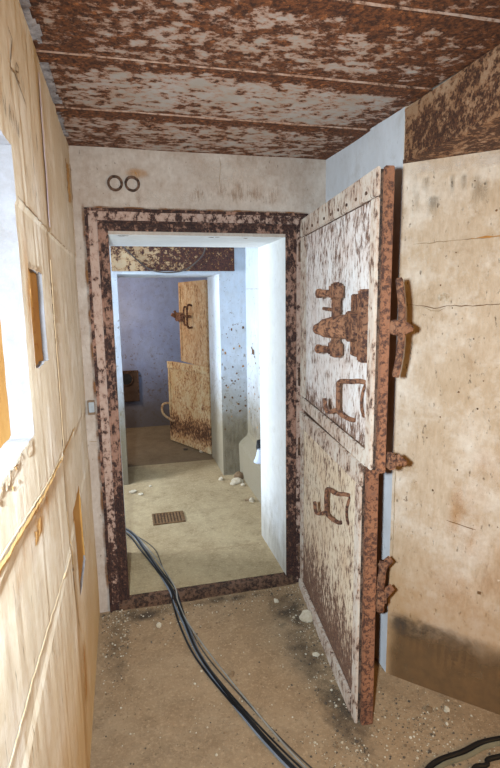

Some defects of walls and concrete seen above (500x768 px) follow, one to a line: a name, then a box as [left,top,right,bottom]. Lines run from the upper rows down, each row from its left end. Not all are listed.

crack [418,235,500,244]
crack [416,303,500,311]
damp [392,617,500,715]